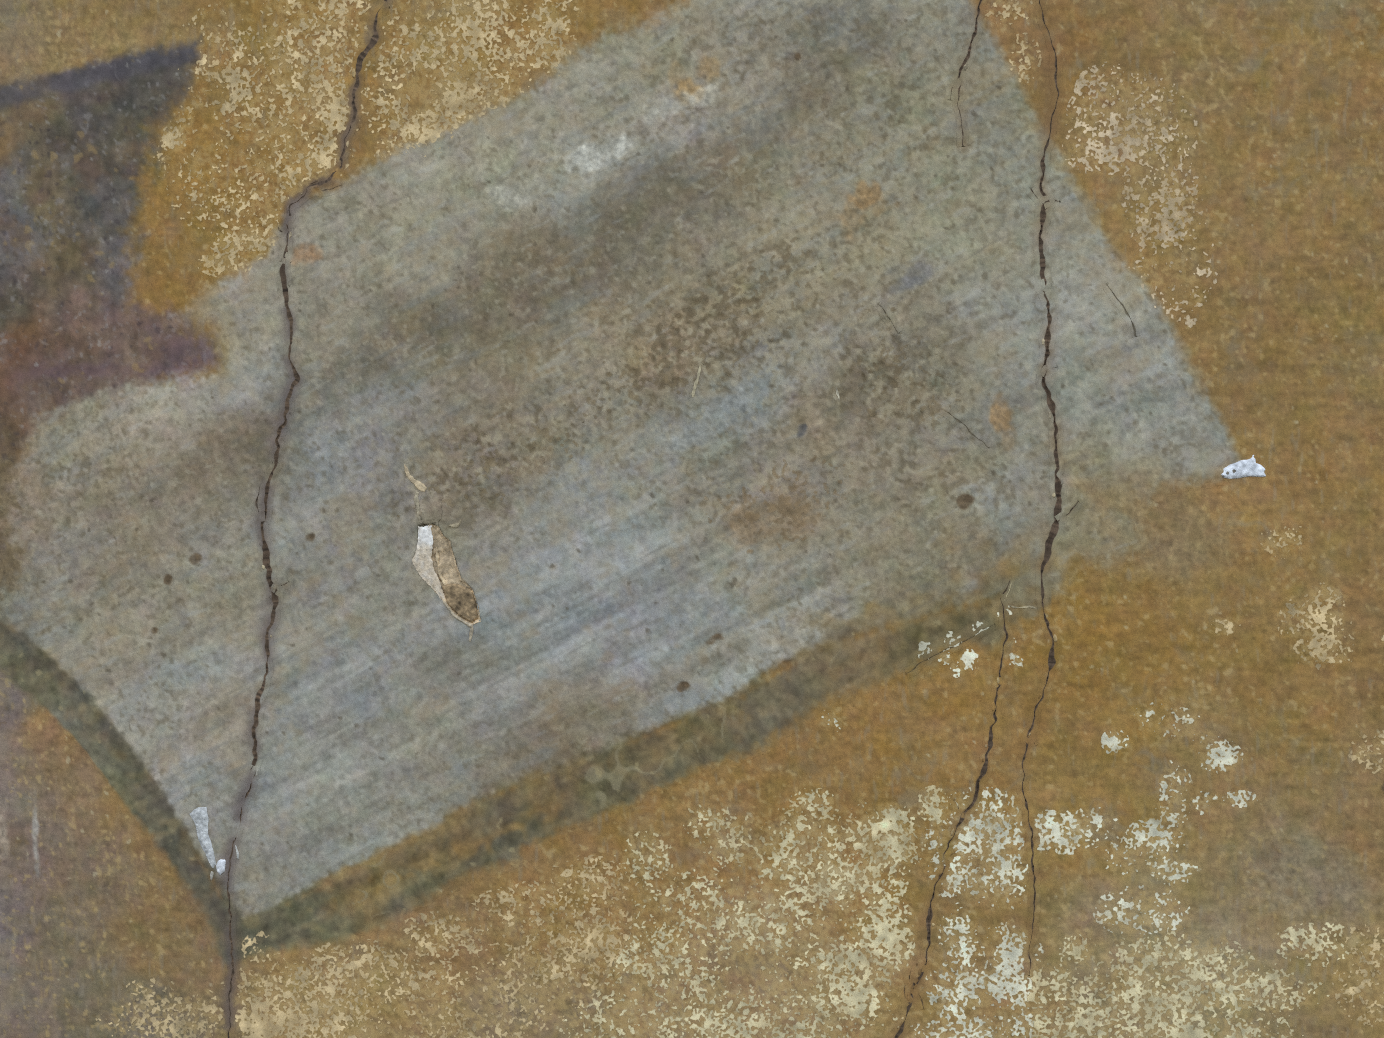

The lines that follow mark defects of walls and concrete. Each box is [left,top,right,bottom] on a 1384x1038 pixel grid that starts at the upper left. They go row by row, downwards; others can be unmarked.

peeling [153,0,584,277]
efflorescence [484,173,548,212]
efflorescence [558,75,726,177]
peeling [1062,62,1218,328]
crack [222,0,393,1038]
peeling [397,236,856,642]
leakage [659,368,782,454]
peeling [918,605,1012,678]
crack [888,0,1082,1038]
leakage [1096,464,1244,600]
leakage [30,790,41,882]
peeling [95,702,1384,1038]